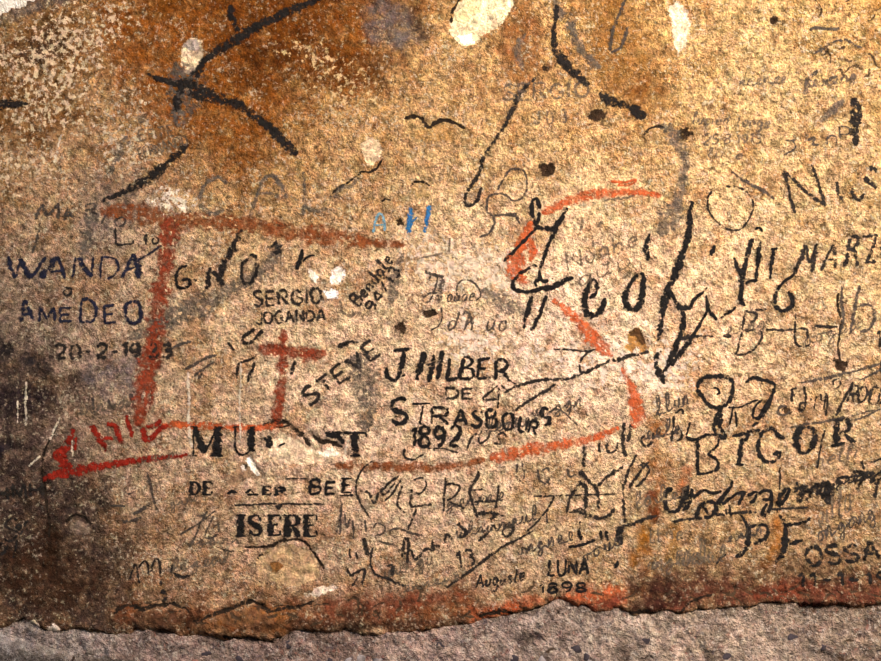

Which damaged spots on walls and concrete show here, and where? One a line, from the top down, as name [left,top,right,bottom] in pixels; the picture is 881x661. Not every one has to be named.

leakage [0,0,400,227]